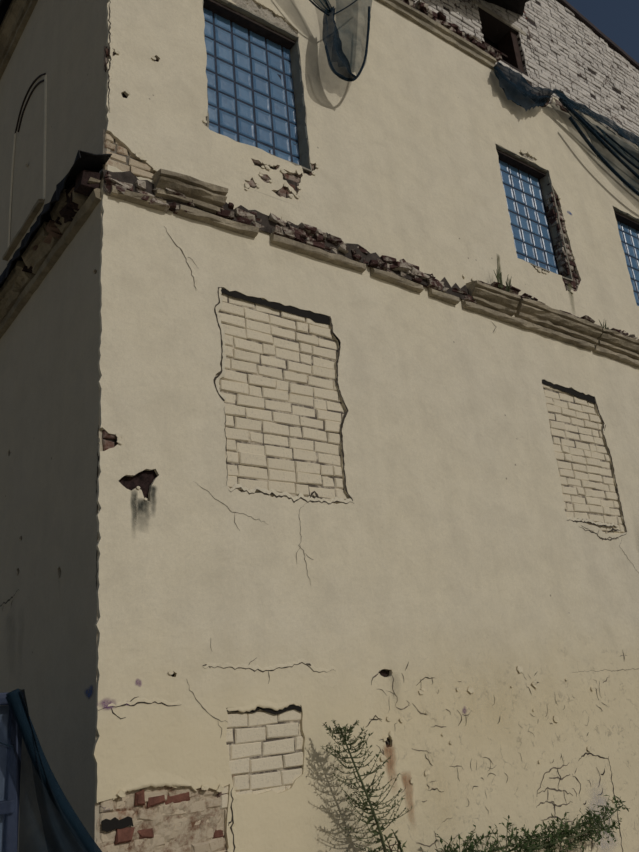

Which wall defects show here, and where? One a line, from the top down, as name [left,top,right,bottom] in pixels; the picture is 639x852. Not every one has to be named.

crack [106,0,114,113]
spalling [245,159,319,199]
flaking render [216,202,477,304]
flaking render [472,277,545,304]
crack [201,287,354,573]
hole [119,470,157,501]
crack [202,645,336,683]
crack [97,681,227,738]
crack [366,662,475,761]
crack [401,749,508,813]
crack [492,650,639,852]
spalling [97,784,240,852]